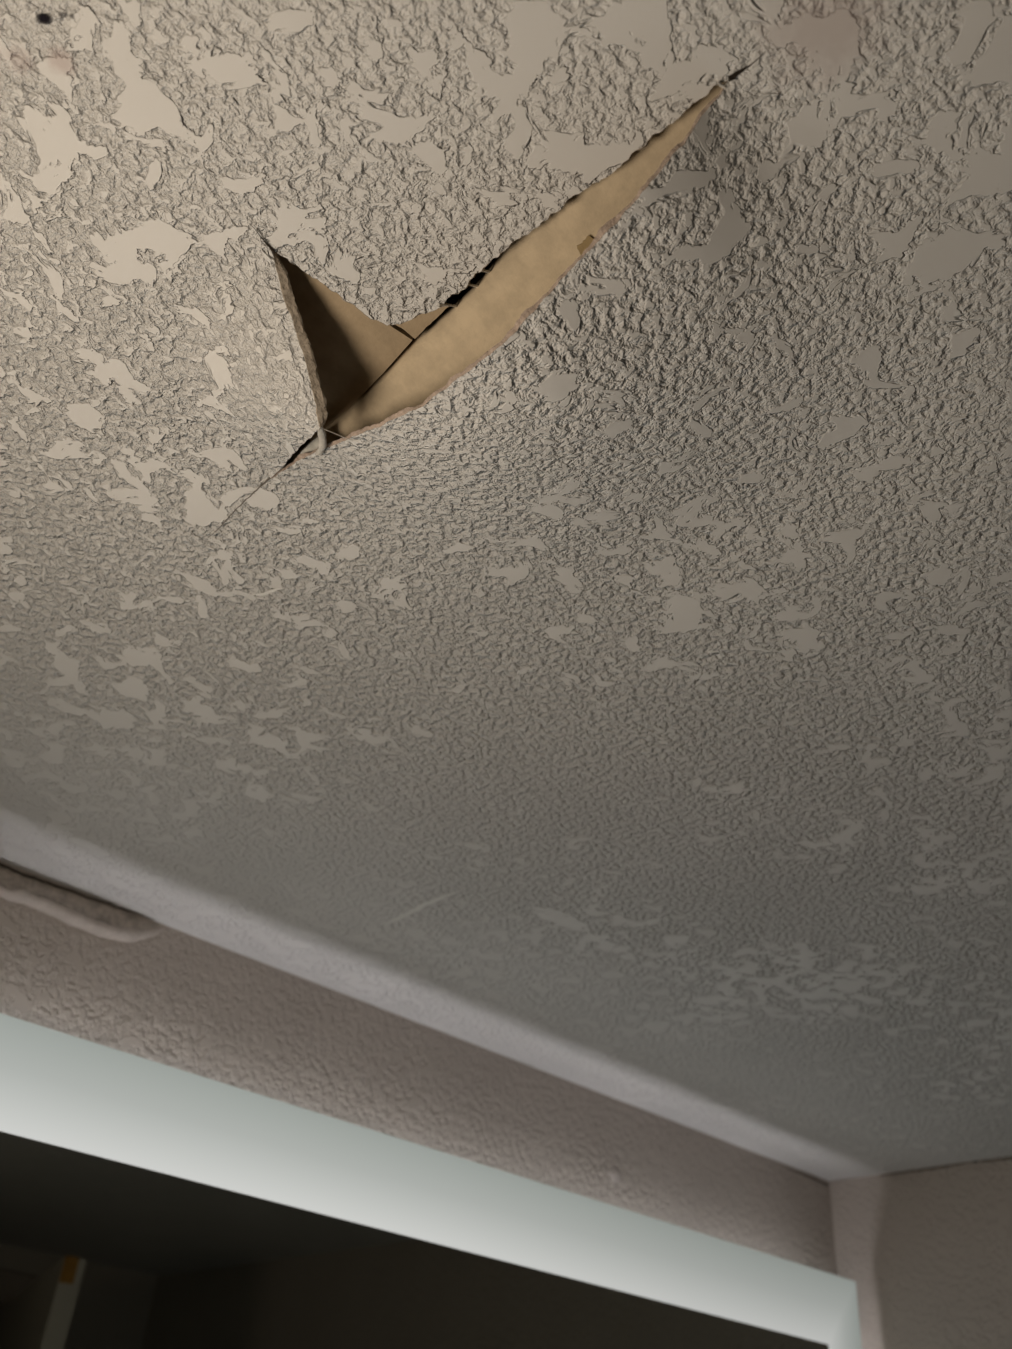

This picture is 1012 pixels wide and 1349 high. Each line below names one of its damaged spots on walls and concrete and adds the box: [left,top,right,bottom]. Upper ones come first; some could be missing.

crack [728,52,765,82]
crack [249,223,276,254]
crack [206,477,271,540]